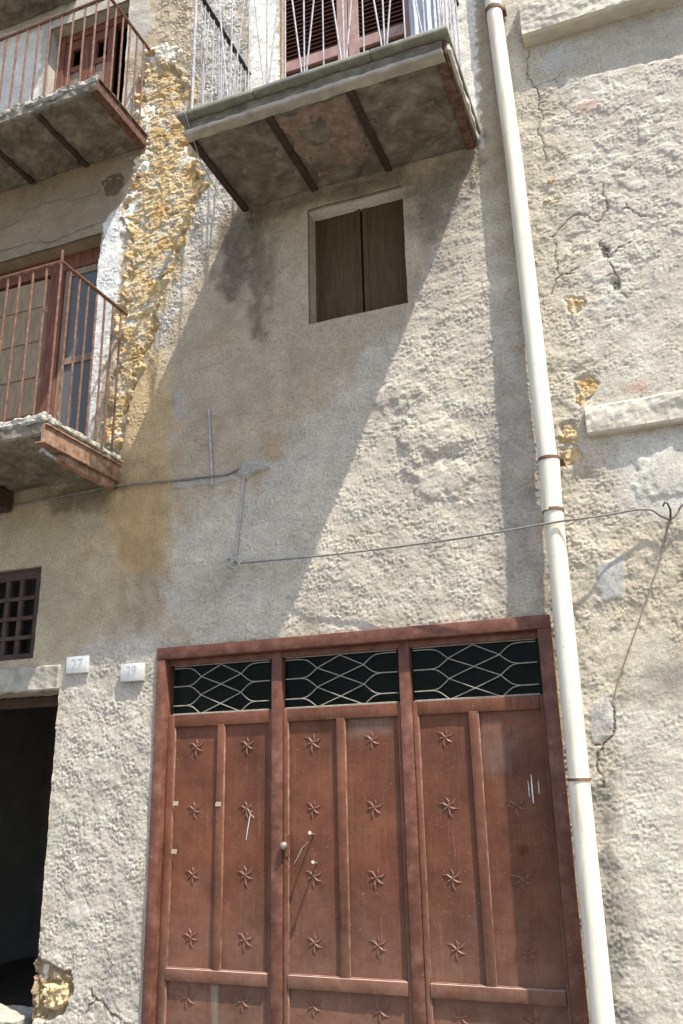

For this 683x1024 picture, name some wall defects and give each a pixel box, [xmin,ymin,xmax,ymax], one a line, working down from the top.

crack [526,49,563,165]
flaking render [98,43,211,463]
crack [551,185,646,298]
flaking render [564,293,585,314]
flaking render [574,376,599,406]
flaking render [559,424,582,467]
flaking render [31,955,74,1021]